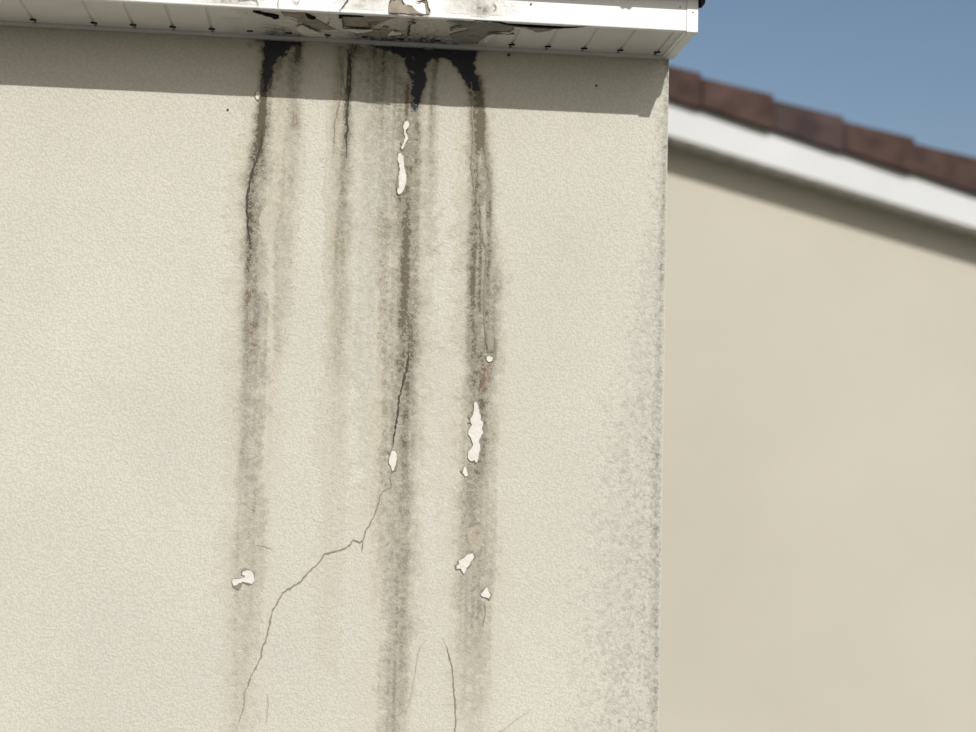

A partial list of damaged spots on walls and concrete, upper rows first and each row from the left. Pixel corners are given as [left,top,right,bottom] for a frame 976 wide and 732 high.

peeling [281,0,430,38]
peeling [446,20,553,44]
spalling [396,120,410,195]
leakage [211,8,513,732]
crack [392,349,409,448]
spalling [460,401,484,477]
spalling [232,568,256,590]
crack [236,476,392,731]
spalling [455,552,476,575]
crack [405,638,457,732]